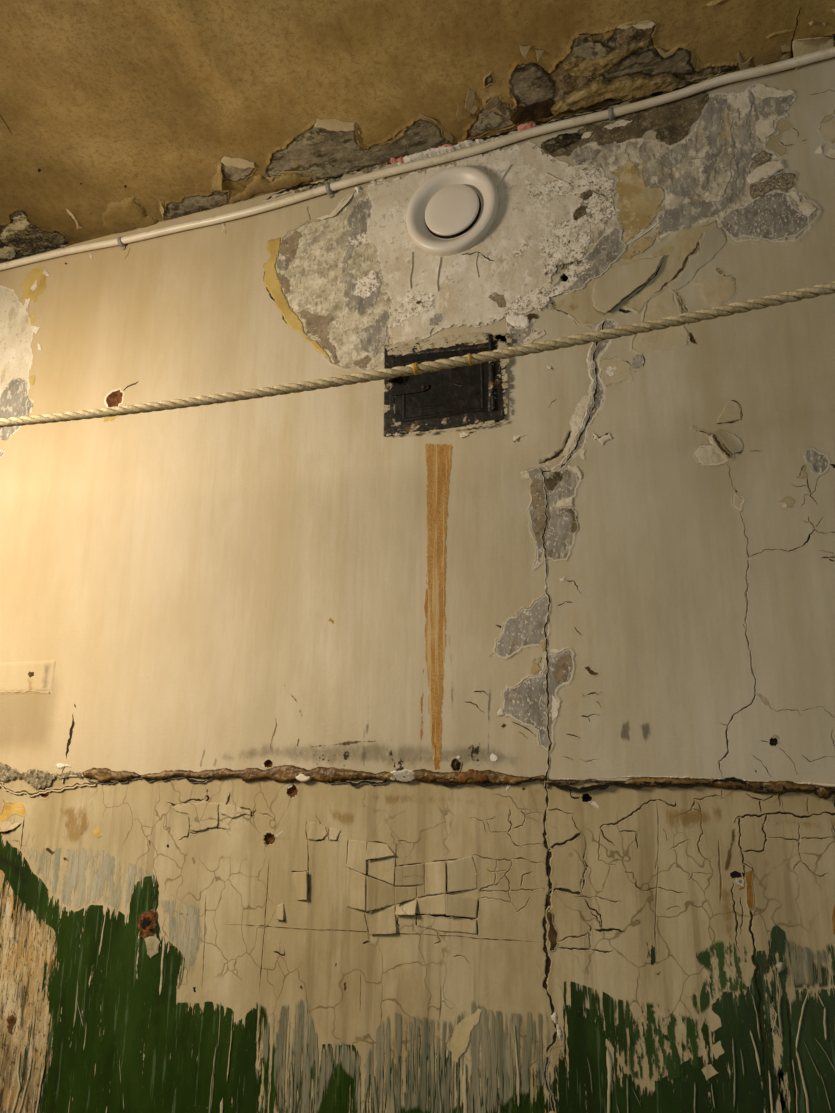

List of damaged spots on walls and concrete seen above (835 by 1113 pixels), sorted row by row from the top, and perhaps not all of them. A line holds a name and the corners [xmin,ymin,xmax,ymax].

flaking render [102,20,825,388]
flaking render [0,266,49,459]
peeling [690,399,761,467]
spalling [779,446,835,510]
corrosion [420,444,453,770]
peeling [500,626,603,764]
crack [463,299,835,1113]
crack [19,816,27,850]
crack [164,789,278,842]
crack [305,815,343,843]
crack [259,859,271,992]
peeling [0,798,835,1113]